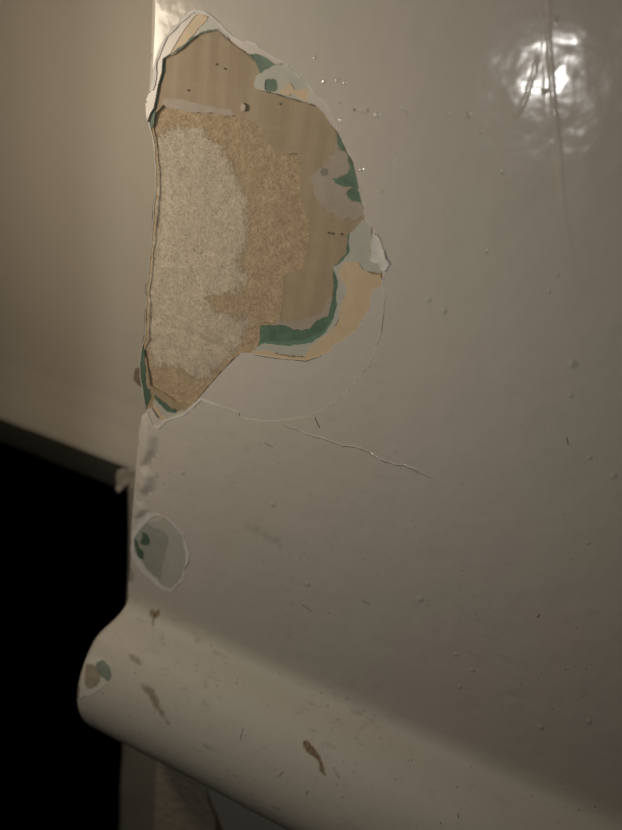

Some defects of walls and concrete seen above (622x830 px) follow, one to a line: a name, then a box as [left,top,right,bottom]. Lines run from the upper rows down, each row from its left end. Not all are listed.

peeling [134,9,390,429]
crack [283,422,436,478]
peeling [131,513,190,592]